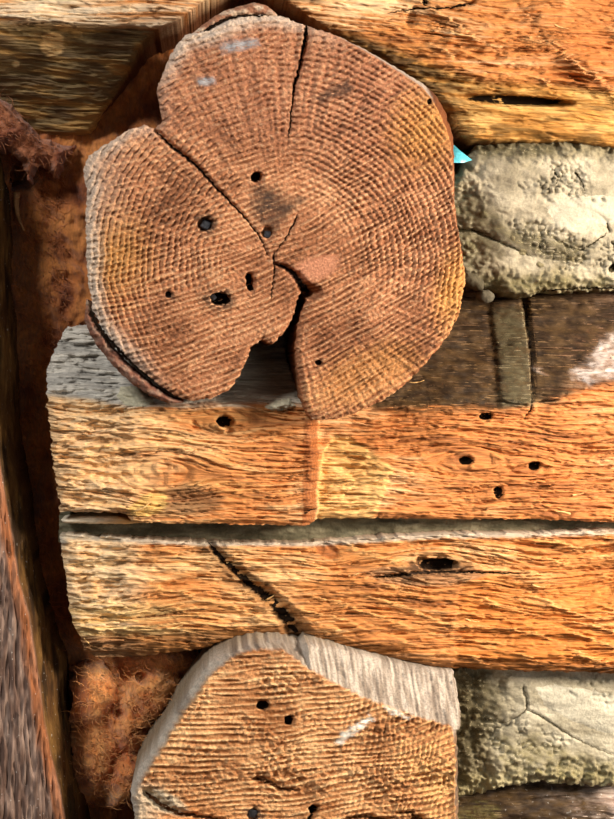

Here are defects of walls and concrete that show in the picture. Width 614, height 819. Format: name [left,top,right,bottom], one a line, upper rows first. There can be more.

crack [203,14,268,32]
crack [288,25,308,138]
crack [157,132,309,299]
water stain [375,287,614,410]
crack [145,792,218,819]